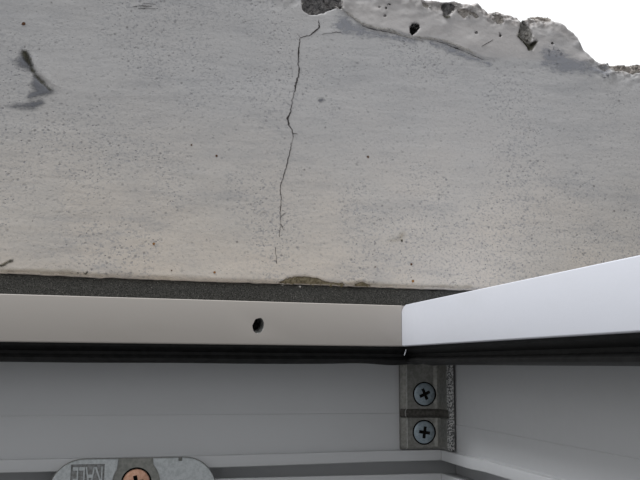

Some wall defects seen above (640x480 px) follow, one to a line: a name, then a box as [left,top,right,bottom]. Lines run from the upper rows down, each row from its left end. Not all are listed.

spalling [301,0,484,60]
spalling [516,17,551,51]
spalling [606,63,640,74]
crack [275,21,339,264]